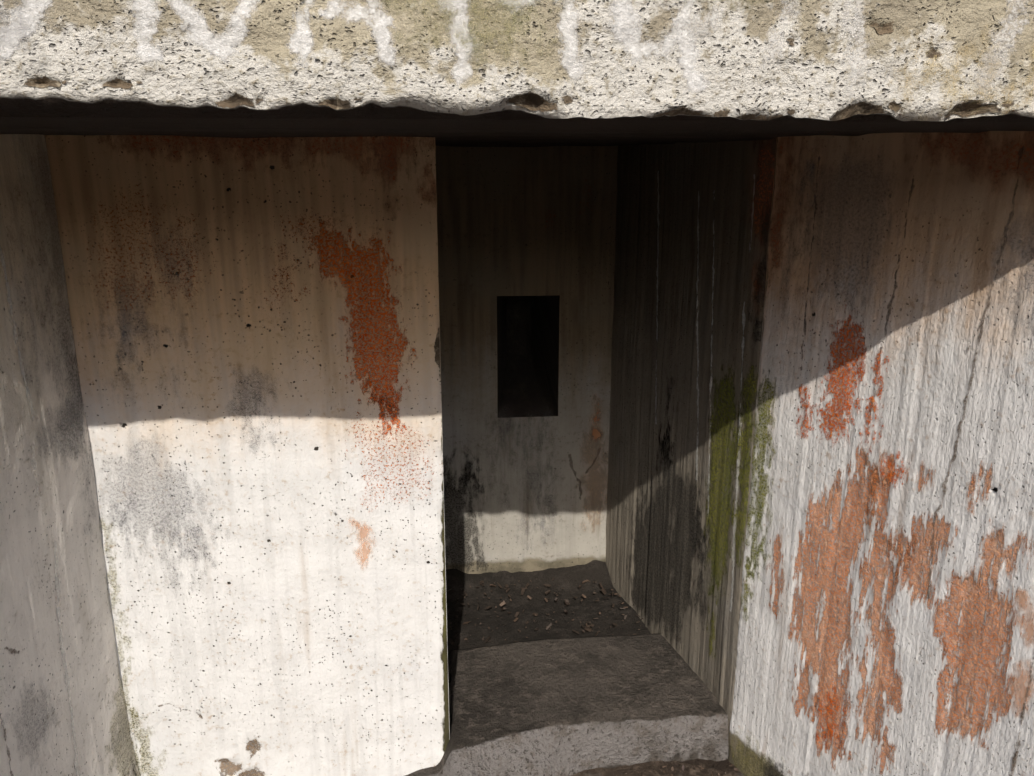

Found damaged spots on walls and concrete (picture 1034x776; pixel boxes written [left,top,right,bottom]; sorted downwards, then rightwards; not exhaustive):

spalling [214,736,264,776]
rust [263,207,434,509]
leakage [443,449,486,573]
leakage [628,307,758,658]
peeling [769,444,1032,774]
crack [927,149,1023,599]